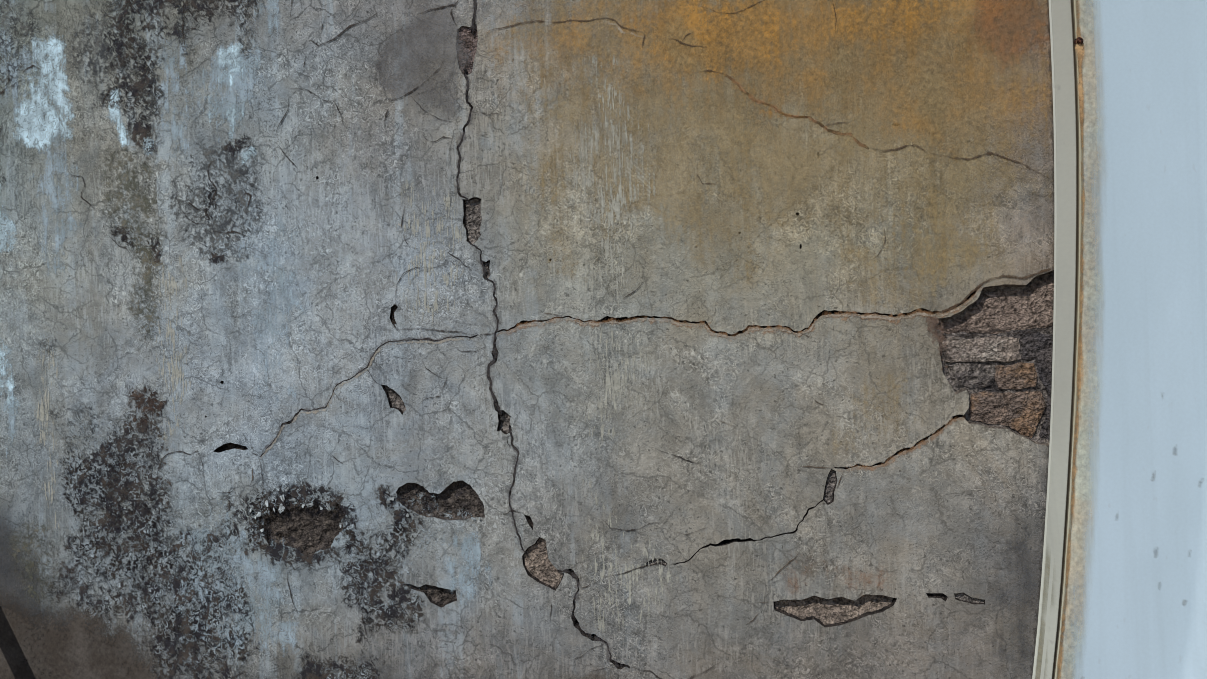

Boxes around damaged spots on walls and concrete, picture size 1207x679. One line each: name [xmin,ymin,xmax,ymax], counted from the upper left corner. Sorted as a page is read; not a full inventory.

crack [277,16,373,165]
crack [384,0,645,203]
crack [675,33,923,151]
spalling [462,197,482,245]
leakage [0,0,432,679]
crack [253,241,1051,554]
spalling [930,270,1054,446]
spalling [177,487,346,651]
spalling [386,480,485,608]
spalling [522,515,564,591]
crack [550,414,964,679]
spalling [773,594,897,627]